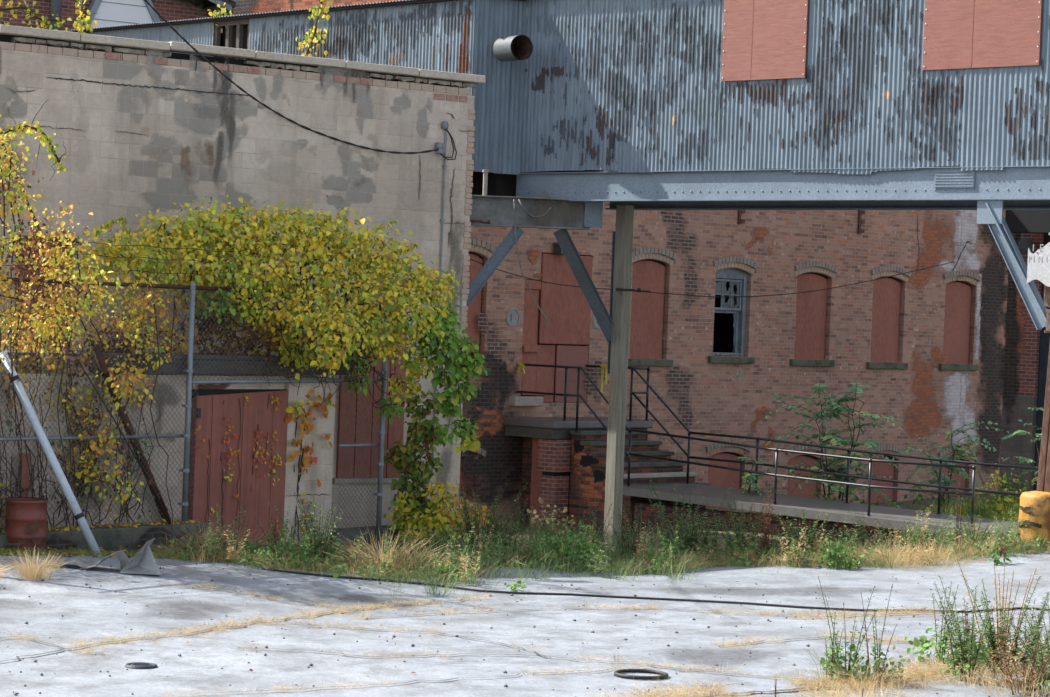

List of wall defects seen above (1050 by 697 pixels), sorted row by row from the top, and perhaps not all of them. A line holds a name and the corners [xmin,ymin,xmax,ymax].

crack [8,39,101,50]
crack [7,59,248,96]
leakage [214,61,235,177]
leakage [344,69,370,99]
peeling [250,0,472,136]
corrosion [445,8,470,73]
peeling [525,0,1050,166]
leakage [939,210,1021,473]
spalling [904,348,948,439]